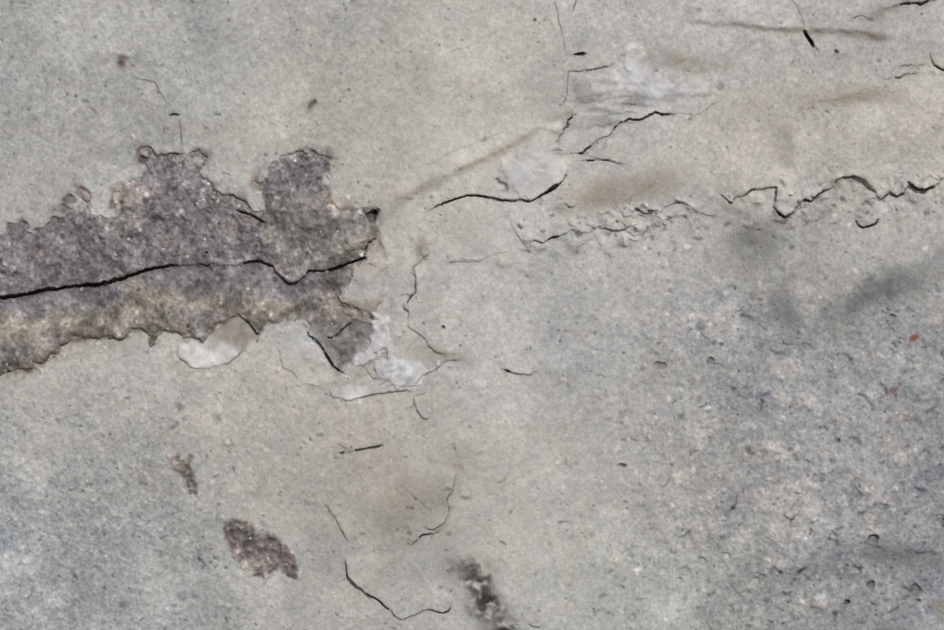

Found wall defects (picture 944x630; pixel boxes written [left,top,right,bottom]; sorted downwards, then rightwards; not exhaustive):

crack [579,112,669,164]
crack [441,180,561,206]
crack [775,189,828,218]
crack [882,183,934,199]
crack [0,263,210,300]
spalling [0,146,444,403]
crack [234,241,372,284]
crack [295,319,350,371]
spalling [170,454,198,497]
spalling [223,520,299,582]
leakage [466,564,509,630]